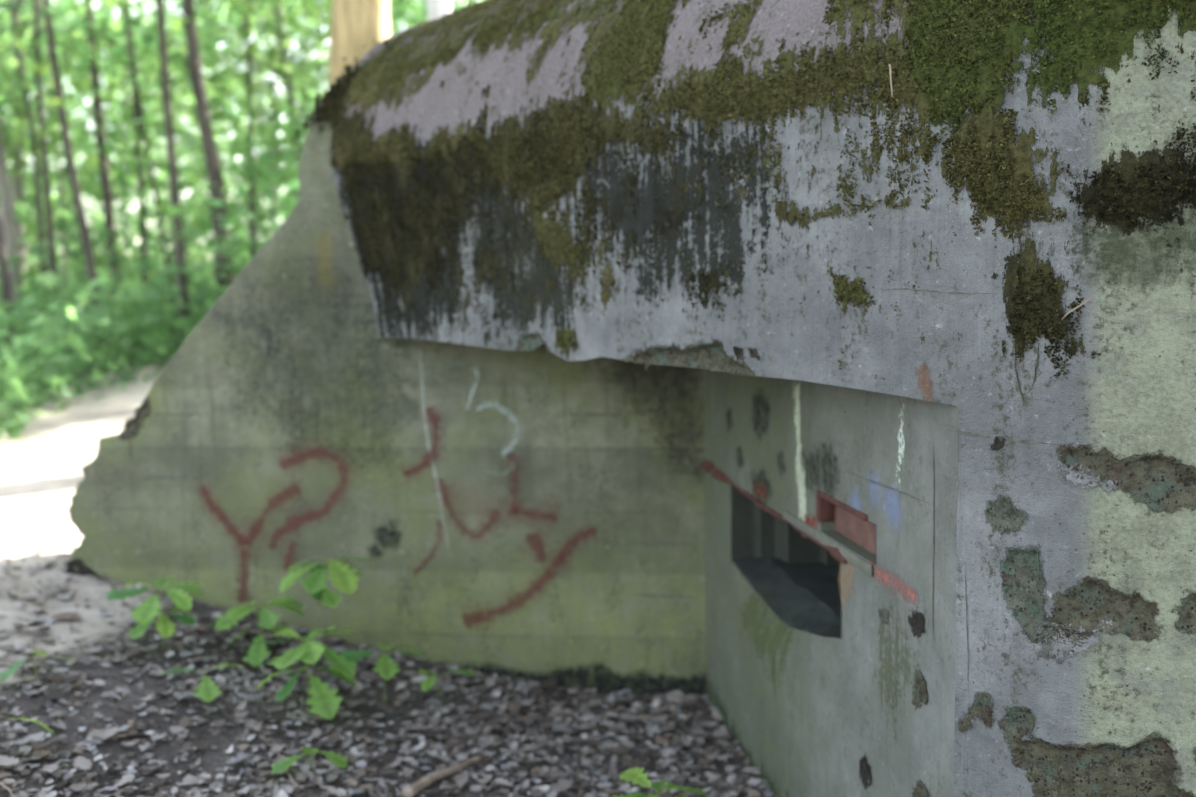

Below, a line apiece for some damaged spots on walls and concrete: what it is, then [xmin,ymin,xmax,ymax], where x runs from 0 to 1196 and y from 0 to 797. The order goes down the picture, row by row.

leakage [331,95,799,339]
spalling [621,339,760,377]
spalling [118,398,151,440]
spalling [1056,445,1196,513]
spalling [64,558,100,579]
spalling [985,495,1196,664]
spalling [908,611,925,638]
leakage [464,663,708,697]
spalling [912,670,928,710]
spalling [958,692,1194,797]
spalling [859,753,872,789]
spalling [912,781,929,797]